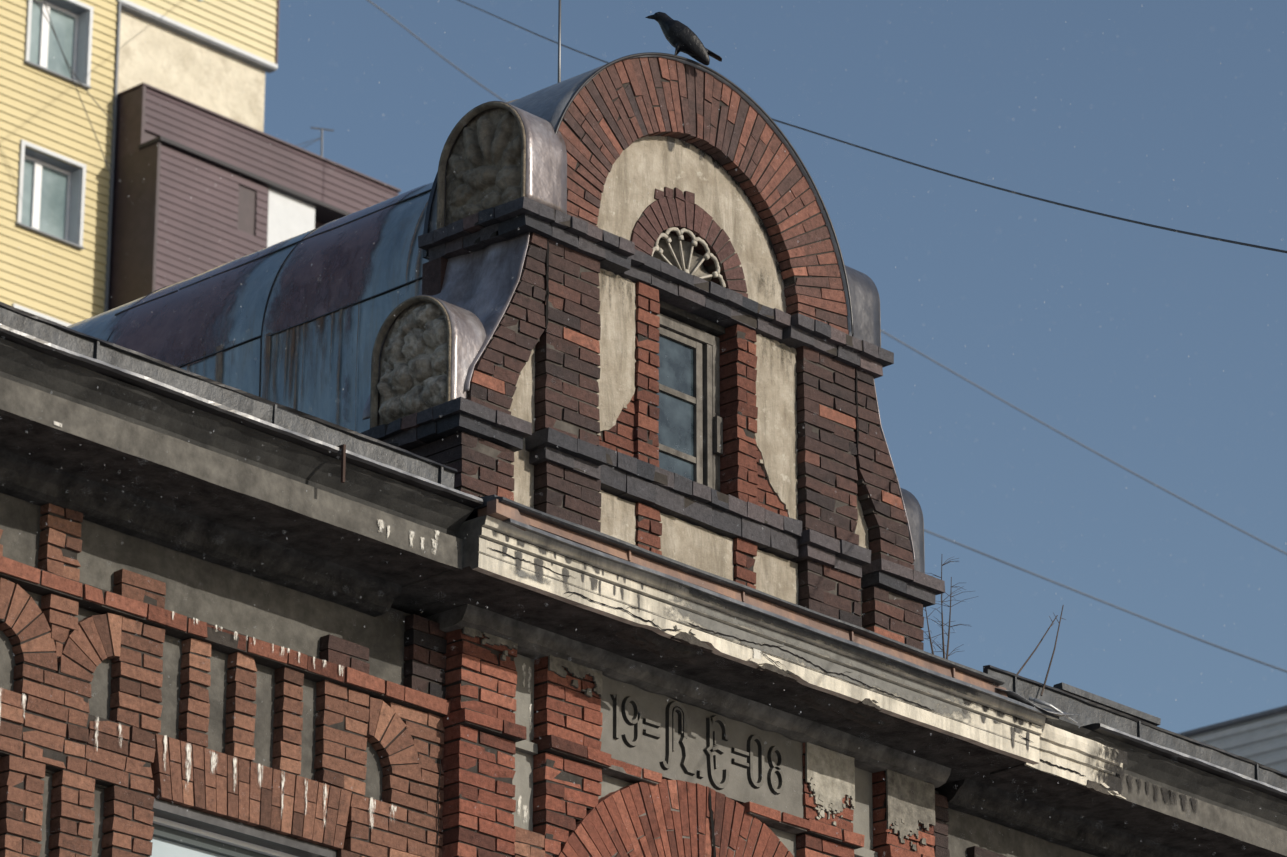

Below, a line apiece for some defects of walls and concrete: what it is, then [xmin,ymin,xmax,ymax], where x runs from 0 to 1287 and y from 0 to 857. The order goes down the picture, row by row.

rust [110,184,429,425]
flaking render [597,395,635,457]
flaking render [755,446,790,517]
flaking render [548,655,603,698]
spalling [670,625,713,652]
crack [487,547,935,711]
spalling [748,658,797,682]
spalling [858,698,882,711]
flaking render [805,742,855,826]
flaking render [886,769,935,852]